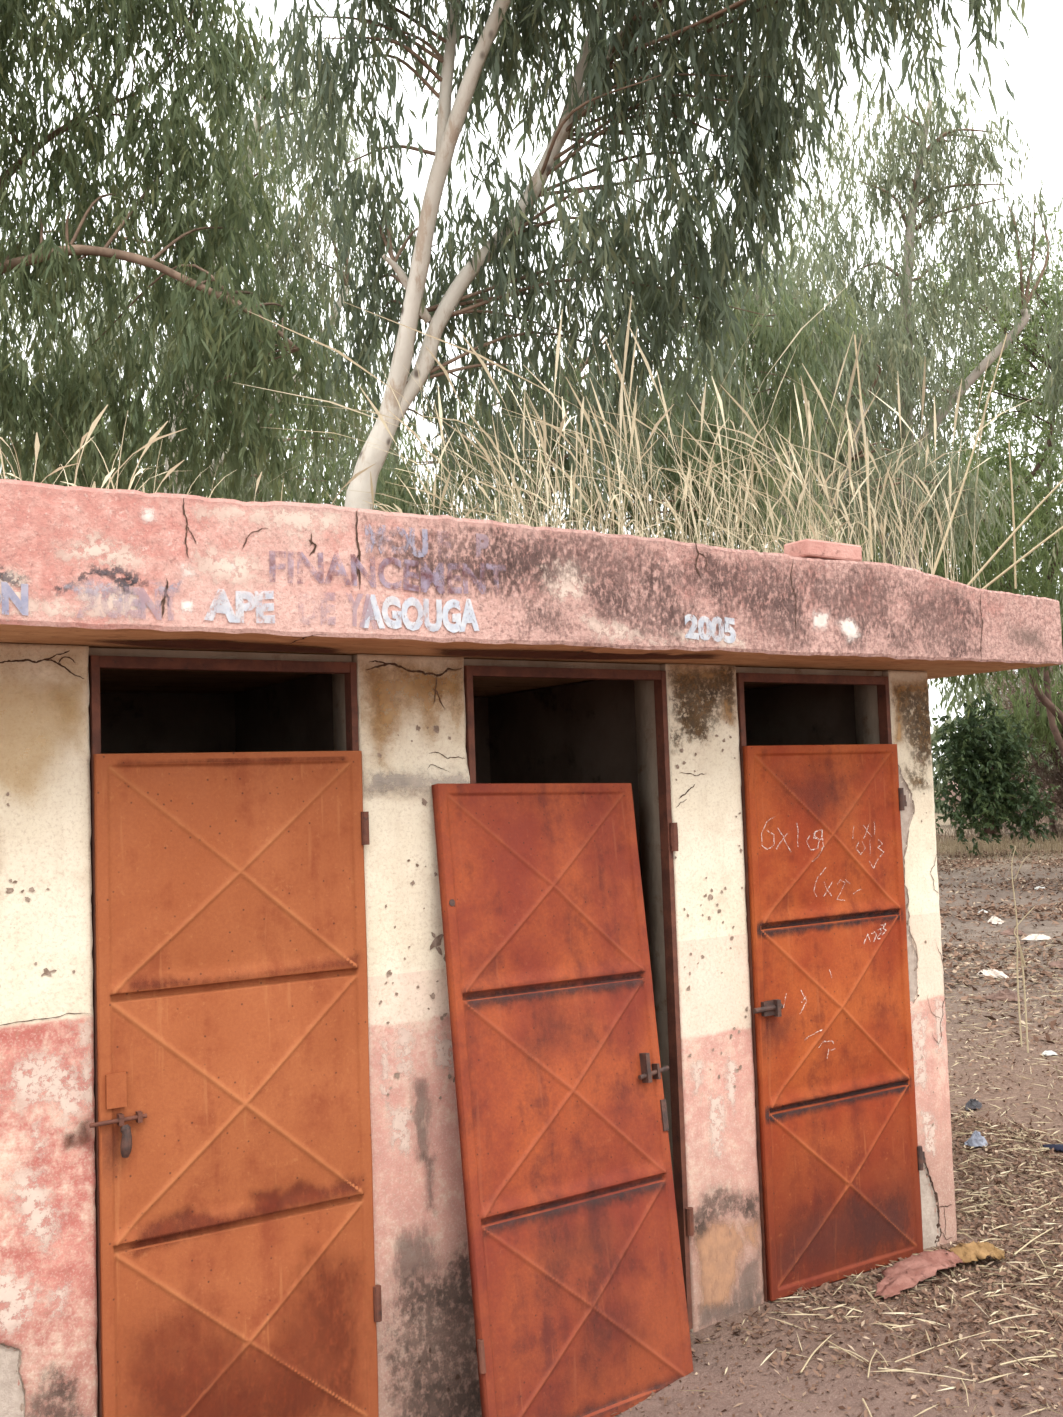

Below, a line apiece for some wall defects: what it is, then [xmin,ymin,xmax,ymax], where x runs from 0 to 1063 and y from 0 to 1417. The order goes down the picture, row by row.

crack [160,498,196,617]
crack [354,512,362,590]
damp [379,536,806,644]
damp [812,571,889,643]
crack [0,650,84,679]
rust [757,910,900,934]
peeling [11,1054,92,1120]
rust [765,1079,911,1120]
peeling [11,1170,55,1243]
rust [136,1182,358,1248]
flaking render [0,1270,36,1417]
damp [401,1242,481,1417]